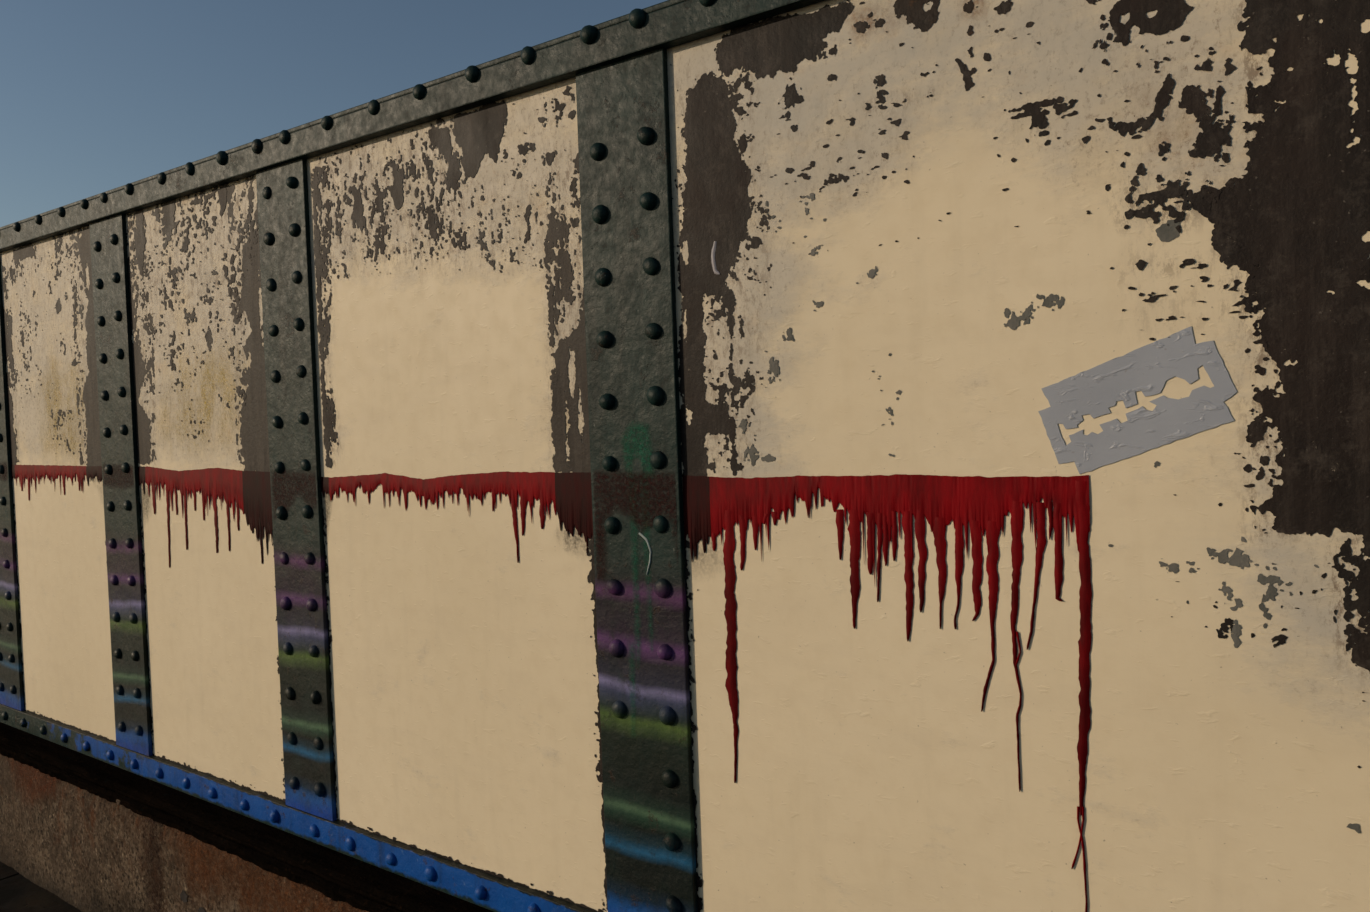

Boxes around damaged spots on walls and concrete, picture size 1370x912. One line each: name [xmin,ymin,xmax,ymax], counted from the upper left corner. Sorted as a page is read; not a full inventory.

peeling [2,226,102,466]
peeling [126,175,270,472]
peeling [311,100,591,473]
peeling [537,85,575,127]
peeling [672,0,940,476]
peeling [955,0,1040,91]
peeling [1004,294,1064,330]
peeling [1004,92,1078,146]
peeling [1082,0,1370,672]